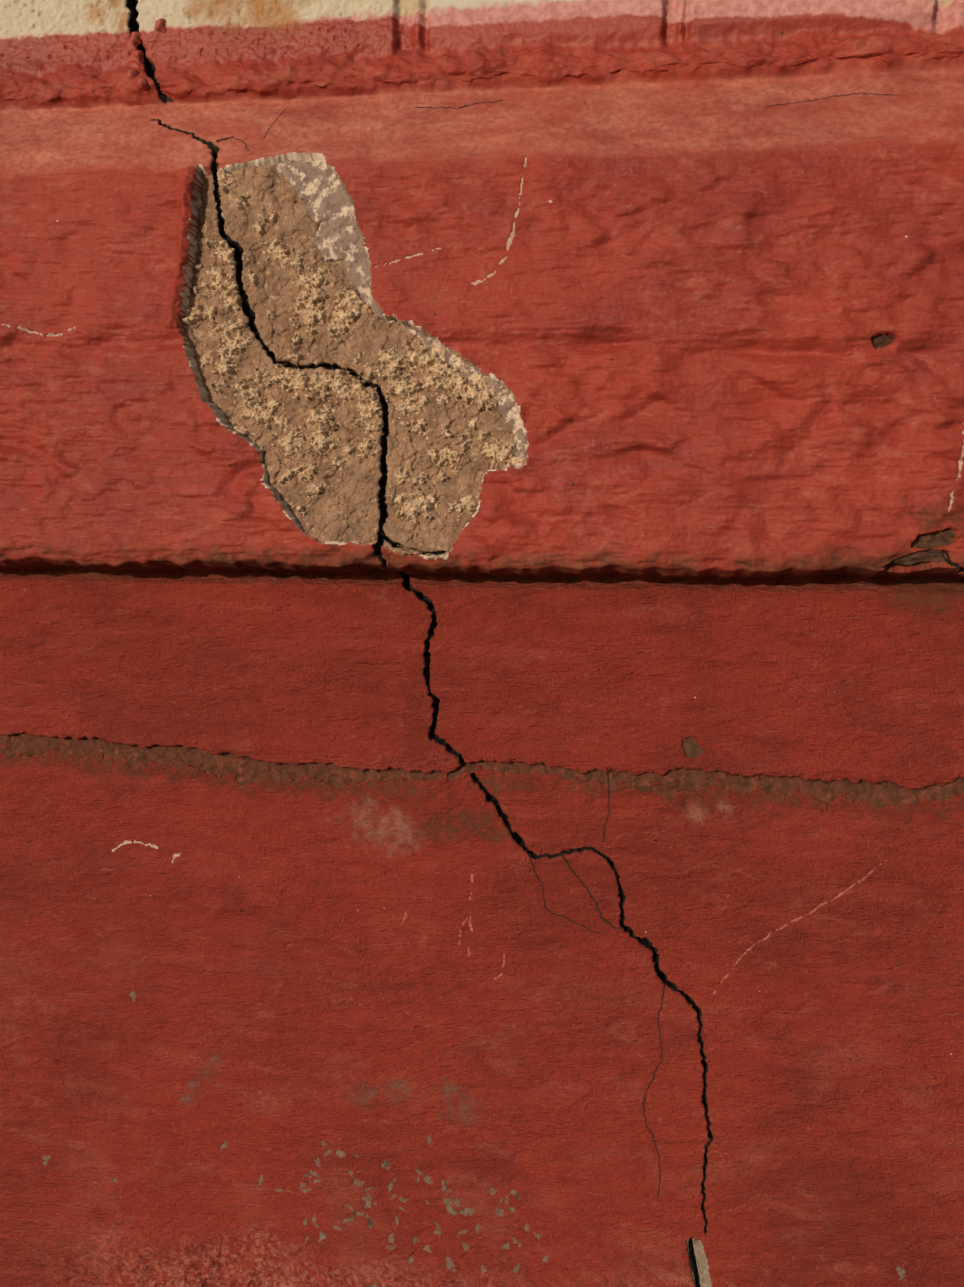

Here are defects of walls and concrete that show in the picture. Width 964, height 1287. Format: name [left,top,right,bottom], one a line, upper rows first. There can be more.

spalling [180,152,529,560]
crack [948,416,964,512]
crack [942,551,964,580]
crack [126,0,887,1287]
peeling [257,1141,408,1250]
peeling [407,1169,480,1272]
peeling [489,1188,520,1217]
peeling [500,1224,542,1249]
peeling [686,1237,712,1287]